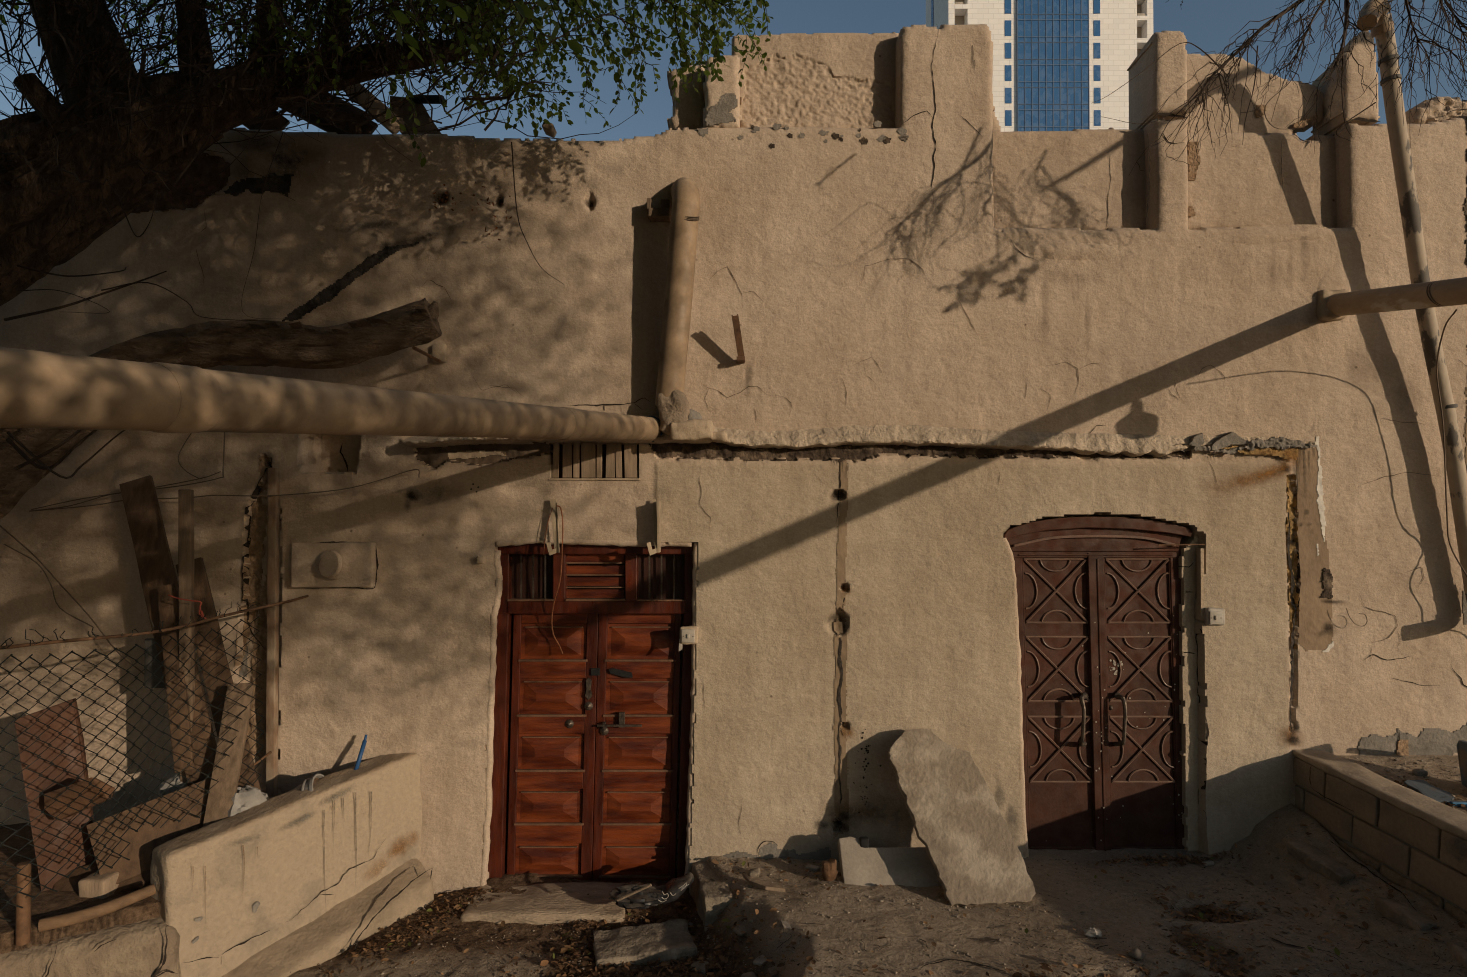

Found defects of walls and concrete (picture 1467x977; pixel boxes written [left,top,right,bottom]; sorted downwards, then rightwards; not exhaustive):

crack [905,26,982,208]
spalling [131,152,294,213]
spalling [415,442,552,469]
spalling [1174,432,1318,460]
spalling [235,455,282,758]
spalling [1357,725,1467,756]
crack [153,840,385,977]
crack [343,868,432,958]